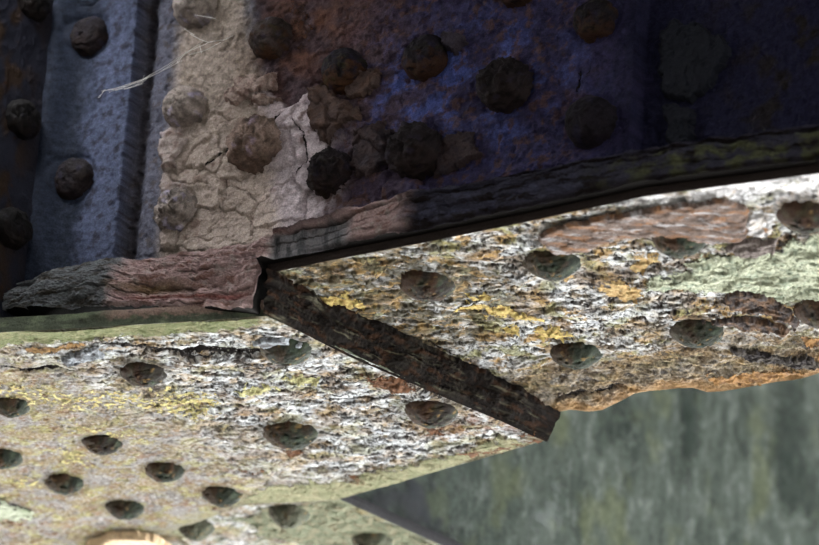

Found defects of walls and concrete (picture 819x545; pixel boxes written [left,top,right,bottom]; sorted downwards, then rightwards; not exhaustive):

peeling [537,197,779,259]
corrosion [360,373,421,395]
corrosion [706,366,805,386]